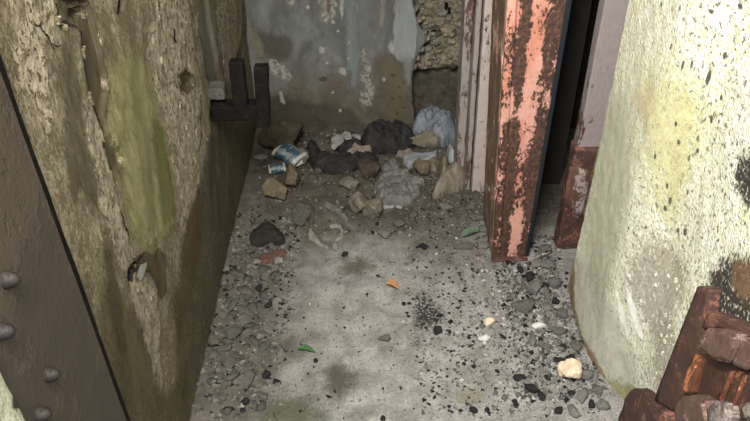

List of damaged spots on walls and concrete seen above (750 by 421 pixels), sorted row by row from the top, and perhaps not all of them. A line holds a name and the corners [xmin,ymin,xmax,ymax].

crack [29,15,62,58]
spalling [388,0,462,81]
peeling [6,0,166,393]
water stain [130,63,175,231]
water stain [101,123,257,421]